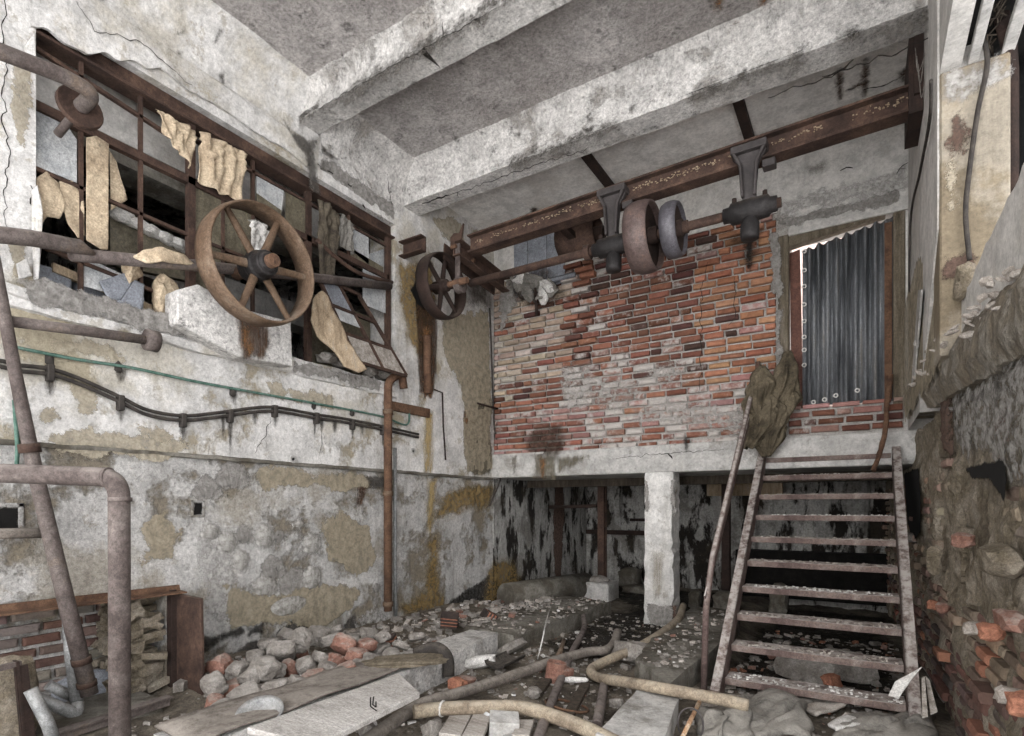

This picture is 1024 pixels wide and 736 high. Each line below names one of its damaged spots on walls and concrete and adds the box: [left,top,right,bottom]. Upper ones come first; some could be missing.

crack [768,38,928,98]
corrosion [835,60,870,100]
crack [422,149,586,204]
flaking render [943,115,972,210]
corrosion [239,321,268,359]
flaking render [441,283,492,475]
flaking render [191,461,370,500]
damp [437,483,494,518]
flaking render [139,511,183,568]
flaking render [222,509,380,678]
damp [402,539,445,613]
damp [485,561,519,601]